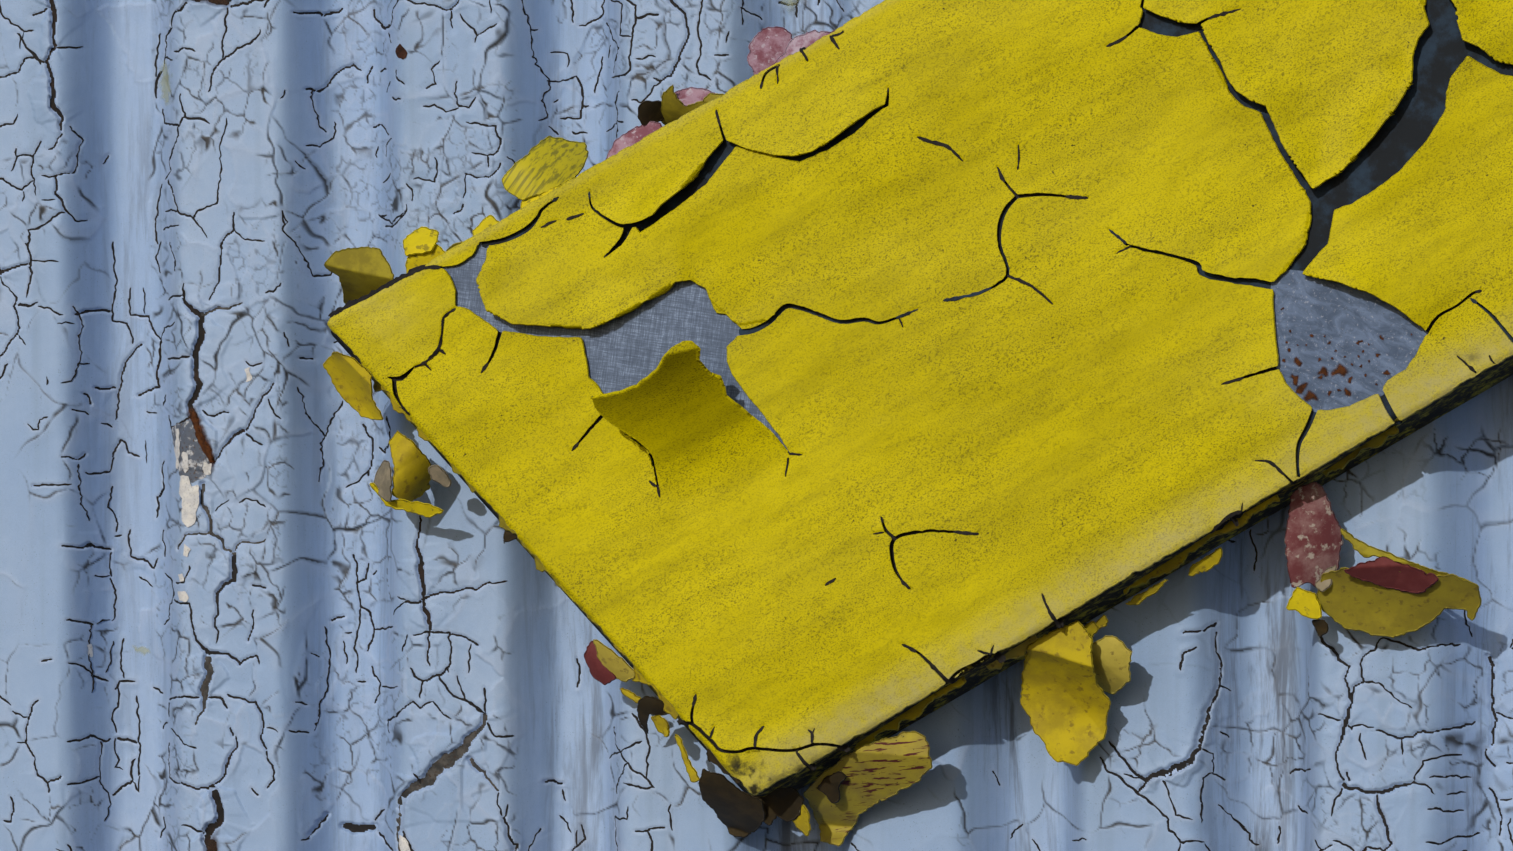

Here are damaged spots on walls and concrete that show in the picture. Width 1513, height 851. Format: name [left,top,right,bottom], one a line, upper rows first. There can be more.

crack [739,136,1088,335]
crack [1106,0,1513,289]
peeling [172,420,212,602]
rust [188,410,213,467]
crack [0,0,889,851]
peeling [324,215,790,453]
crack [1221,367,1277,385]
crack [1255,411,1317,484]
rust [1282,330,1390,401]
peeling [1271,270,1428,412]
crack [1426,289,1513,373]
crack [1100,610,1513,851]